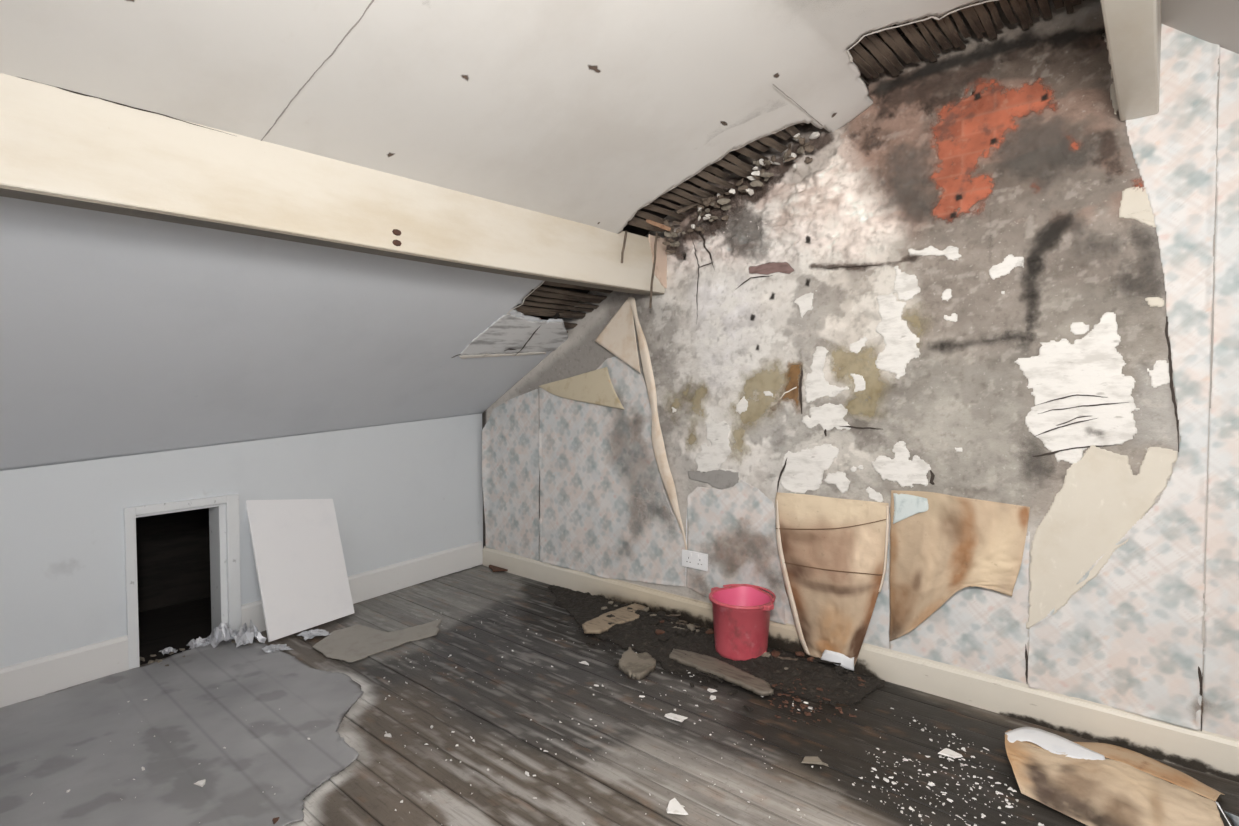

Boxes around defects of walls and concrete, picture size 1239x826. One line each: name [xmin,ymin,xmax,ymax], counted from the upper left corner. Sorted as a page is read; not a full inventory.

spalling [929,77,1057,223]
water stain [998,120,1122,179]
peeling [1119,179,1156,228]
peeling [989,254,1024,294]
water stain [1023,216,1079,323]
water stain [670,386,707,417]
water stain [733,364,789,452]
peeling [780,346,931,502]
water stain [832,348,885,418]
peeling [850,266,921,379]
water stain [934,341,962,351]
peeling [1015,312,1170,464]